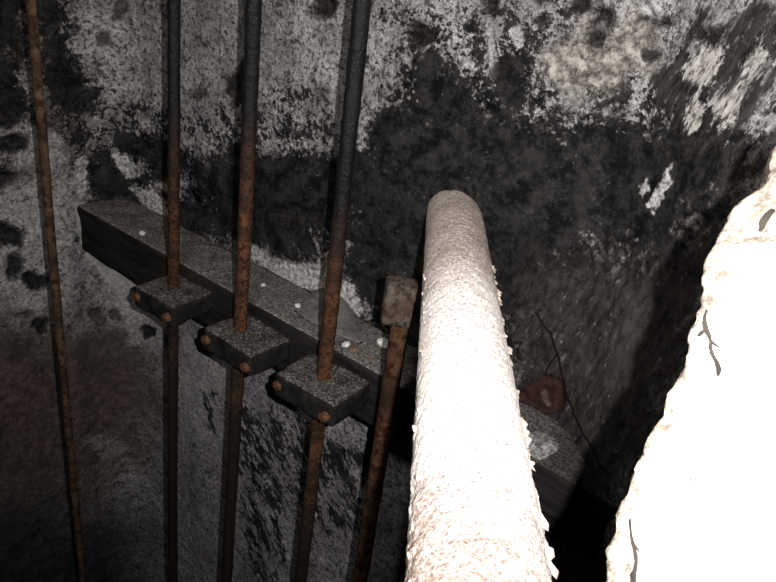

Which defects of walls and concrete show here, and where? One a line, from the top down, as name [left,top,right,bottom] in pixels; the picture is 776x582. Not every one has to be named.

leakage [0,120,90,318]
crack [697,310,722,376]
crack [629,518,640,582]